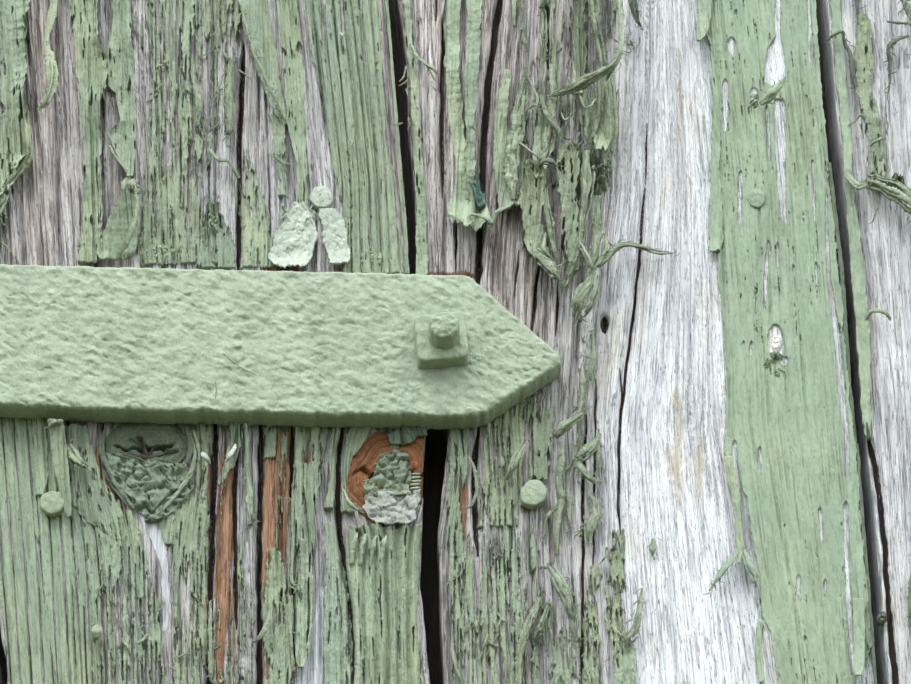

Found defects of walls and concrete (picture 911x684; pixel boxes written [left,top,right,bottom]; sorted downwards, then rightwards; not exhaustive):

peeling [0,0,59,263]
peeling [69,0,680,684]
crack [455,223,483,285]
crack [479,0,503,193]
crack [543,1,551,69]
peeling [696,0,911,684]
peeling [0,417,428,684]